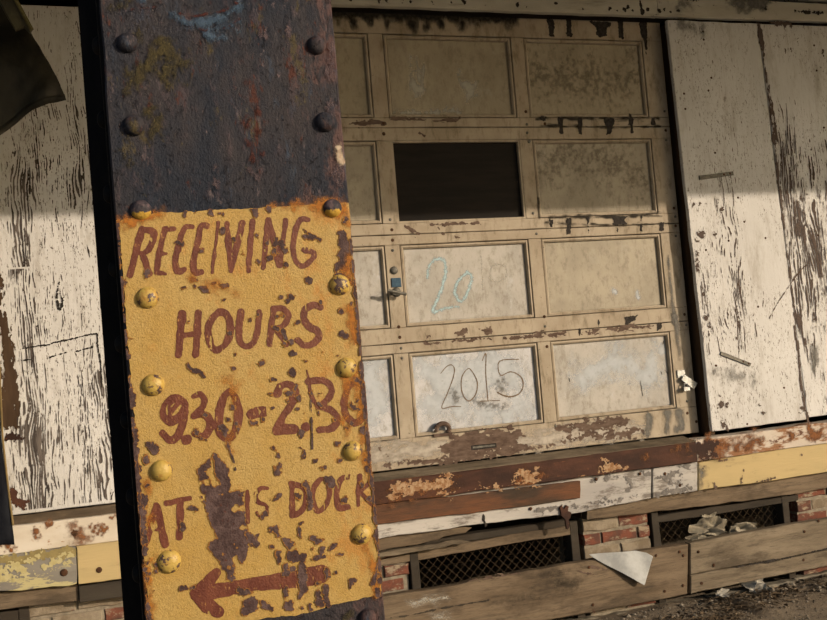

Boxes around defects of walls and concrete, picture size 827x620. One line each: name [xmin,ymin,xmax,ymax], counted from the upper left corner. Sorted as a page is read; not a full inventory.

damp [332,11,518,34]
corrosion [291,198,350,226]
peeling [0,22,114,510]
peeling [695,166,757,375]
peeling [776,97,827,414]
peeling [271,312,309,363]
peeling [284,367,323,416]
peeling [332,216,644,598]
corrosion [33,519,54,539]
corrosion [70,514,116,545]
peeling [187,404,344,617]
peeling [0,545,77,582]